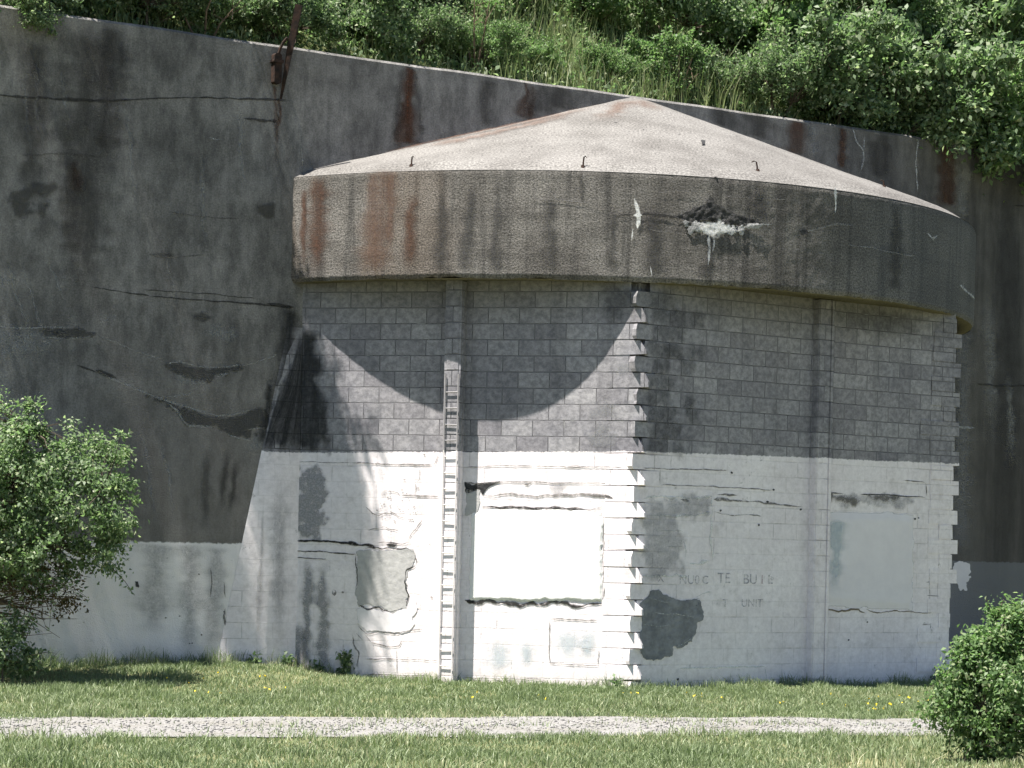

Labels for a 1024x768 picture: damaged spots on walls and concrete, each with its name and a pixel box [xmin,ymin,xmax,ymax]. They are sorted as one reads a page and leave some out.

crack [0,94,283,122]
corrosion [396,68,413,142]
corrosion [300,184,324,255]
spalling [675,195,769,264]
crack [95,287,293,309]
spalling [140,390,269,445]
peeling [464,481,500,516]
peeling [831,480,927,506]
spalling [334,487,423,647]
peeling [953,561,971,591]
water stain [295,569,328,665]
spalling [640,590,709,661]